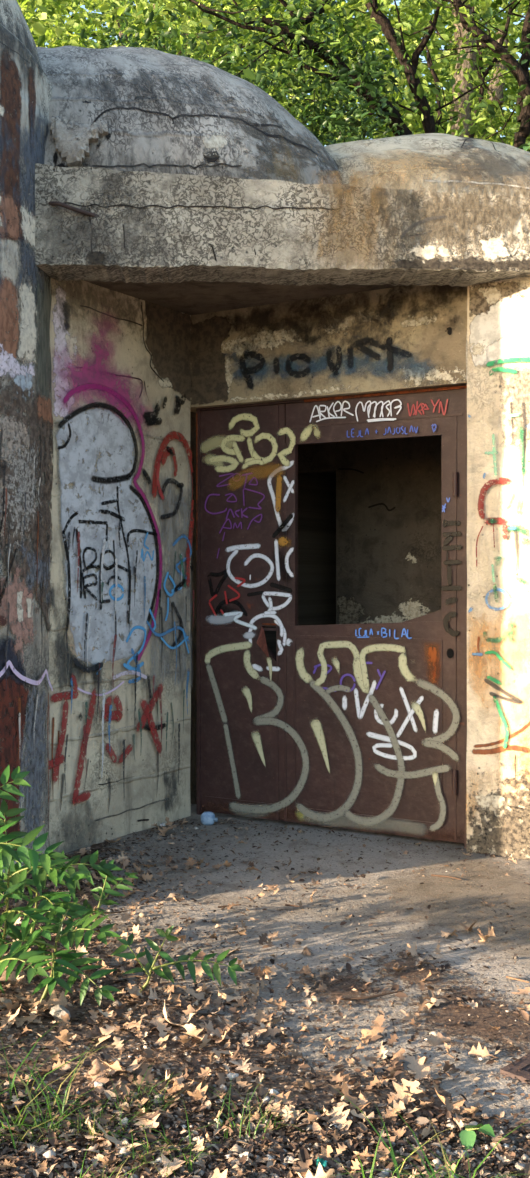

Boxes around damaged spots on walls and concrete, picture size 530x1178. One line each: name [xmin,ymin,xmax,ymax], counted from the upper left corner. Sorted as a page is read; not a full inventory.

crack [84,96,259,126]
leakage [130,73,225,117]
leakage [379,136,530,269]
leakage [229,285,467,362]
peeling [325,310,386,335]
peeling [391,233,530,500]
peeling [337,596,430,624]
spalling [485,679,522,704]
spalling [466,739,530,860]